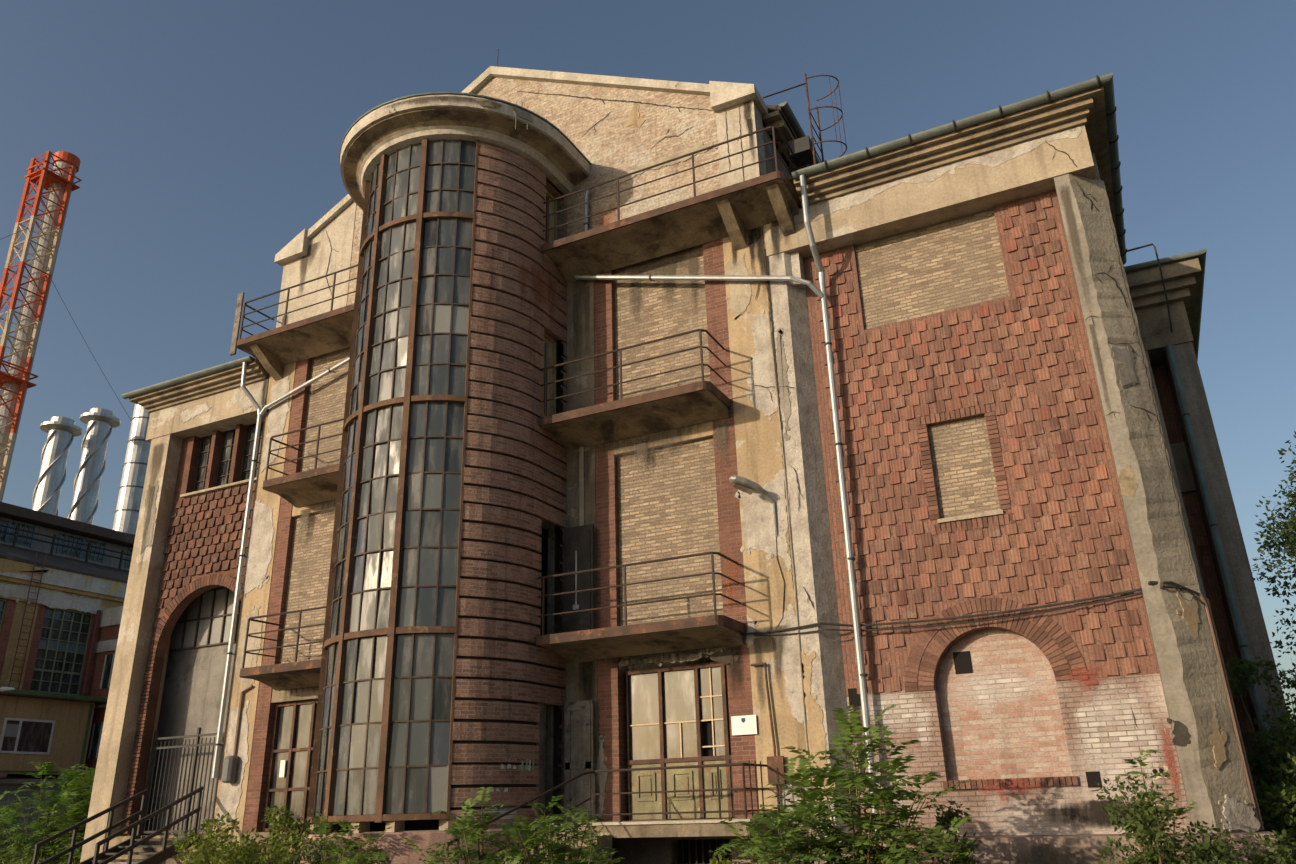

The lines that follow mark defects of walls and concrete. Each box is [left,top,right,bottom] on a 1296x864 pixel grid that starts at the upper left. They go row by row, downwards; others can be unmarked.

crack [1045,140,1193,569]
peeling [734,469,792,571]
peeling [0,558,102,615]
spalling [1218,795,1260,832]